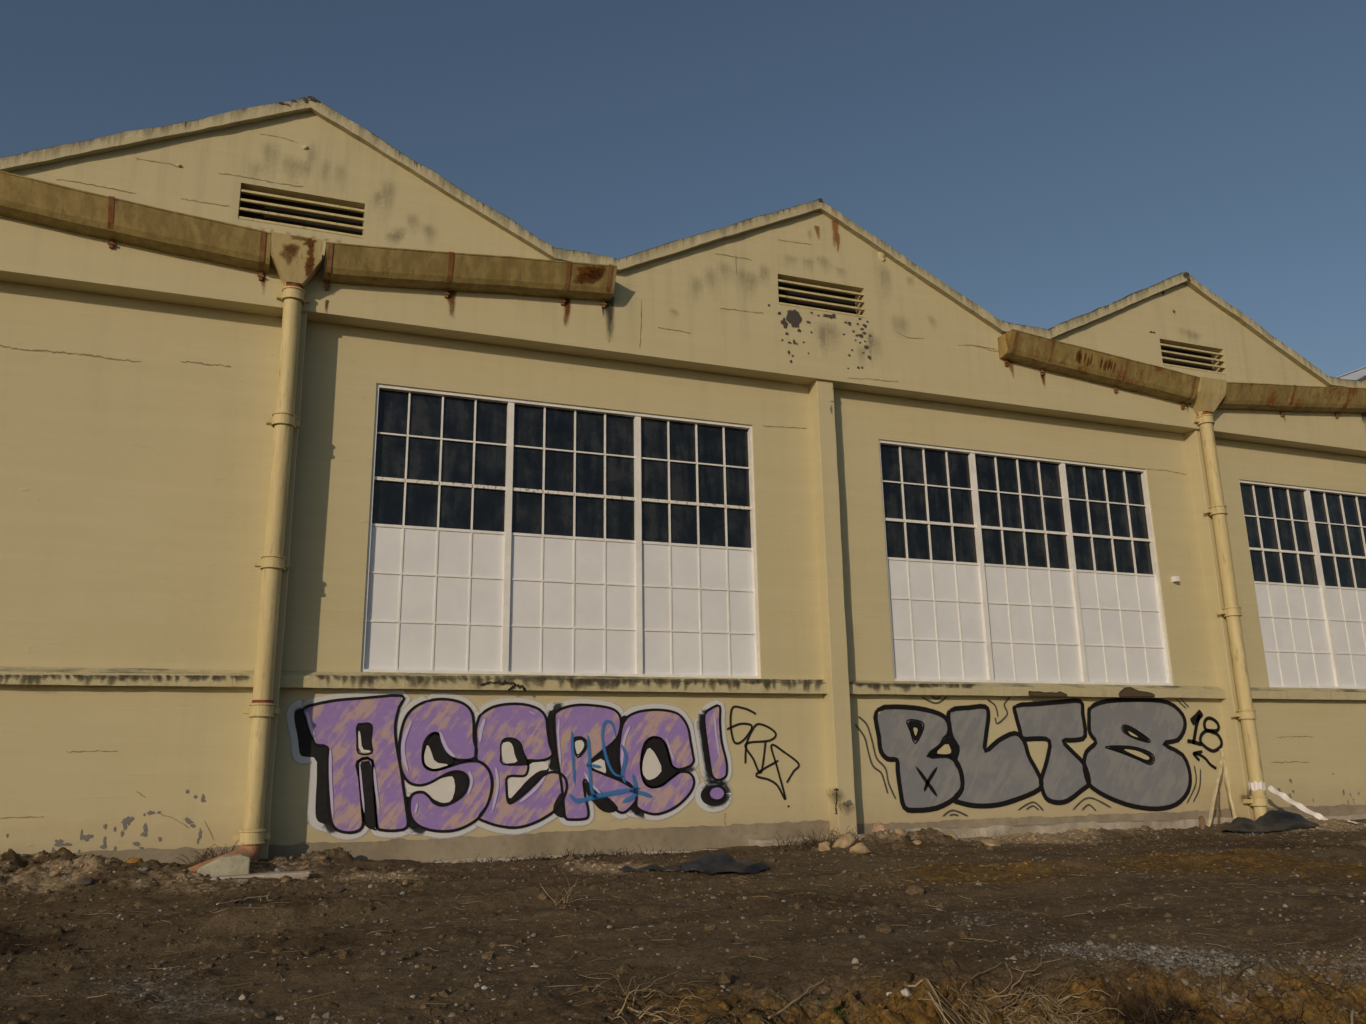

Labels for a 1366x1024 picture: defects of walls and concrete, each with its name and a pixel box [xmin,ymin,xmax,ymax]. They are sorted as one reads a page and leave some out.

corrosion [286,238,316,289]
corrosion [574,265,605,283]
crack [0,345,140,362]
peeling [768,304,871,369]
corrosion [1076,350,1116,372]
peeling [52,810,162,853]